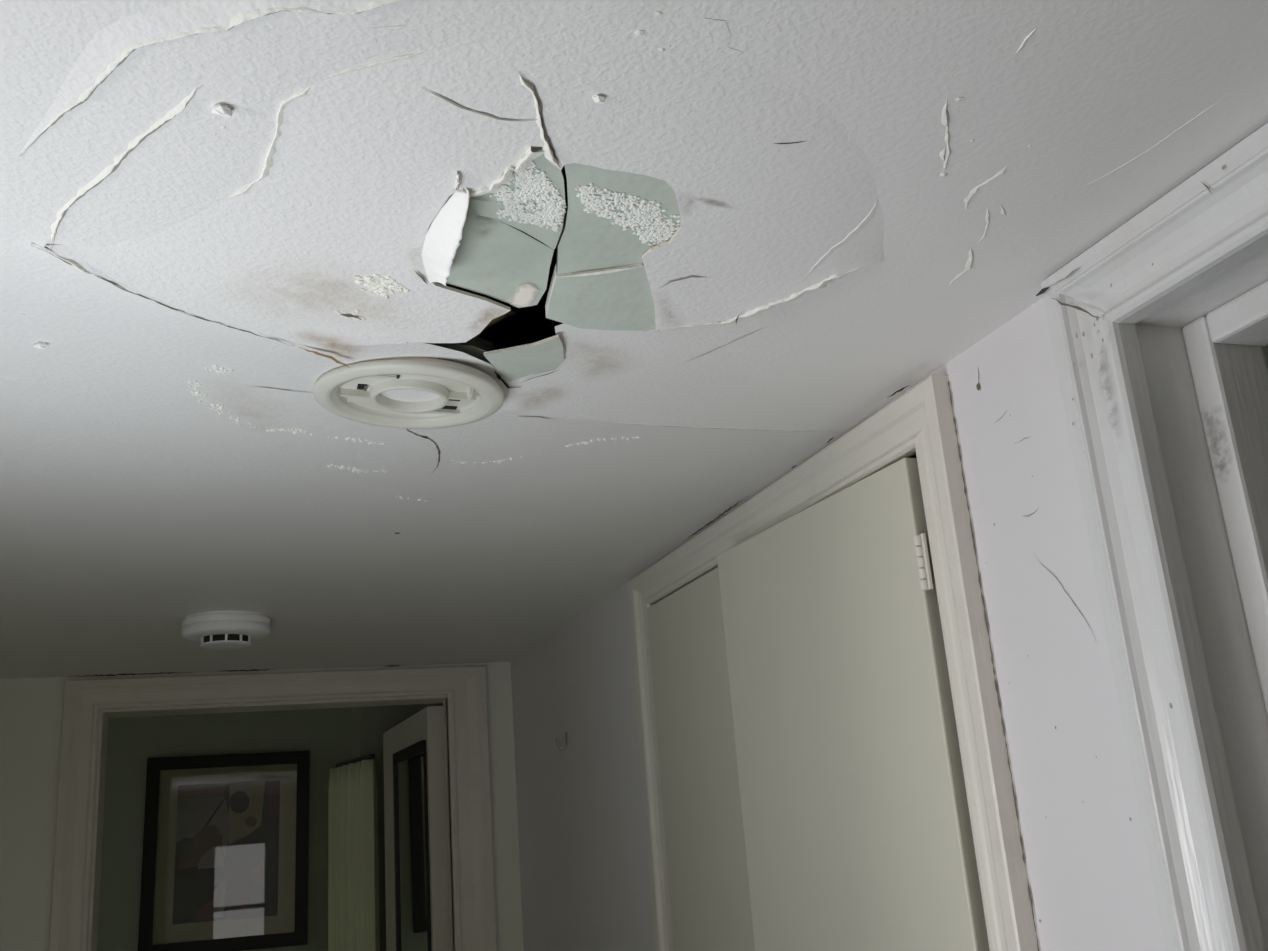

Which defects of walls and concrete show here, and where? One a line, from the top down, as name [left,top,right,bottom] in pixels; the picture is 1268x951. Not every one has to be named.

peeling [22,0,403,155]
spalling [354,274,410,299]
spalling [415,147,881,388]
peeling [334,309,366,321]
crack [406,429,440,470]